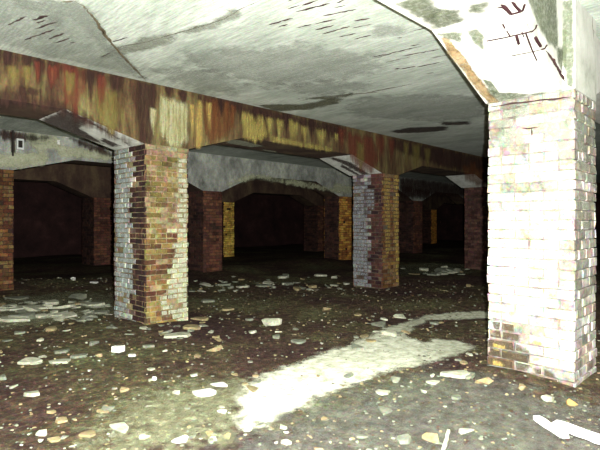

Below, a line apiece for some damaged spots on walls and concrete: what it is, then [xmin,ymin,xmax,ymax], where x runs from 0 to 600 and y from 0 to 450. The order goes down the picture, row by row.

crack [165,1,259,37]
crack [63,1,150,79]
rust [442,37,498,103]
crack [546,51,566,82]
leakage [393,121,470,133]
leakage [0,133,112,168]
rust [464,164,487,184]